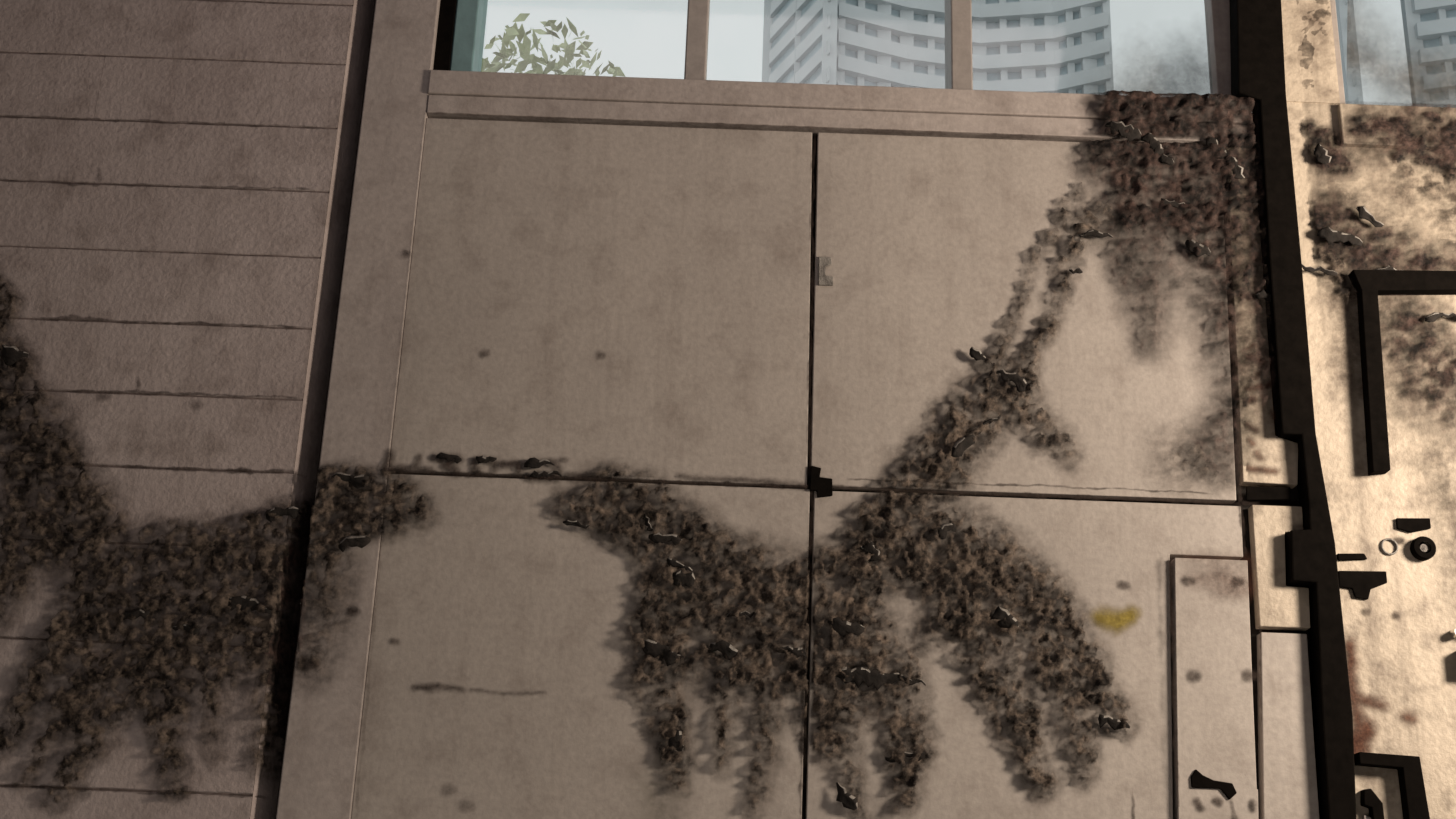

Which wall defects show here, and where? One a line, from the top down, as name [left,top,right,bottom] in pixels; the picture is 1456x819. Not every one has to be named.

leakage [0,275,430,803]
leakage [553,90,1276,818]
leakage [1302,104,1456,300]
leakage [1379,294,1456,428]